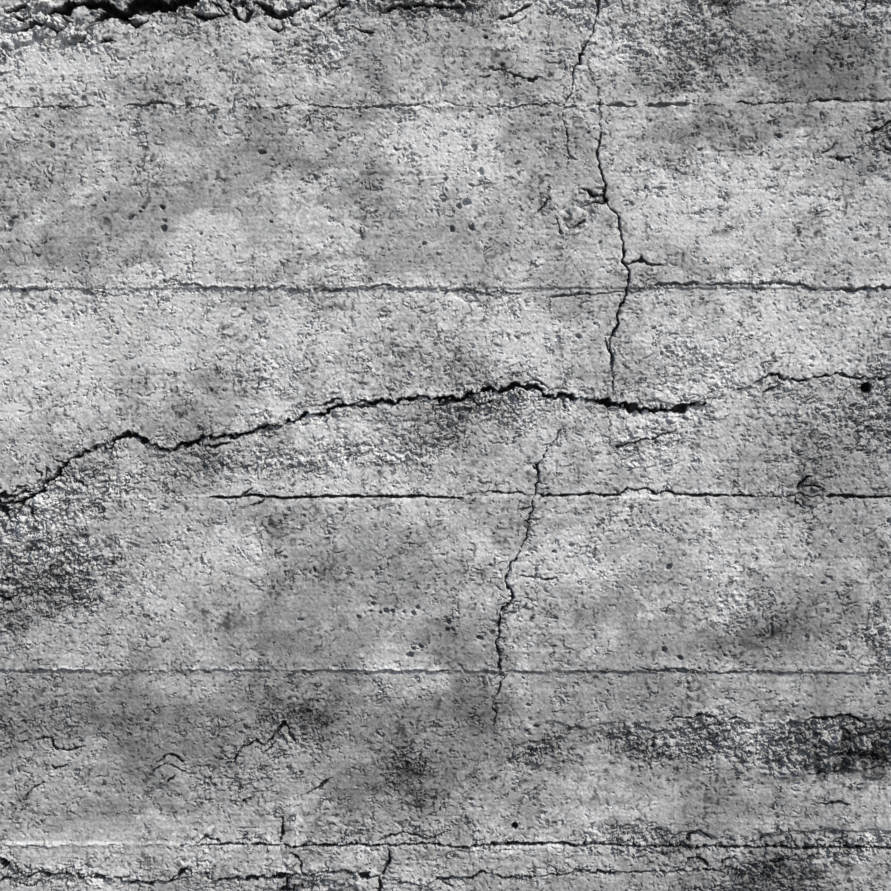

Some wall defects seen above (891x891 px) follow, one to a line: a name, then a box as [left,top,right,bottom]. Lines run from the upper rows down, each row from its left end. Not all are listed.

crack [160,0,891,733]
crack [0,431,152,529]
crack [0,817,890,891]